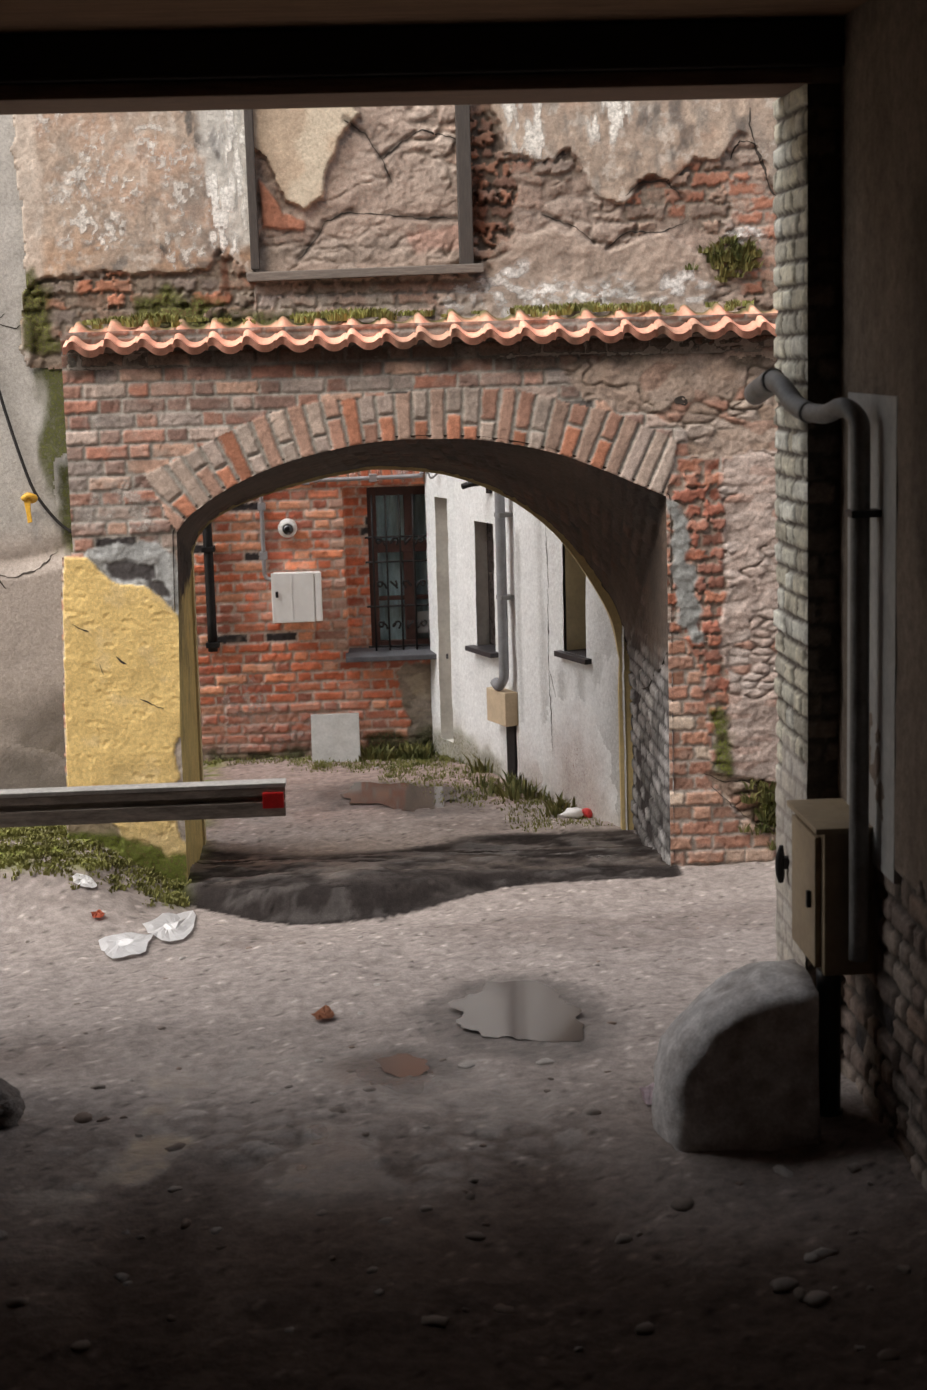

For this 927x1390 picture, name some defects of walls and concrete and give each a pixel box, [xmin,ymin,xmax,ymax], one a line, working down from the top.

spalling [31,101,778,369]
damp [34,368,73,552]
crack [0,551,58,589]